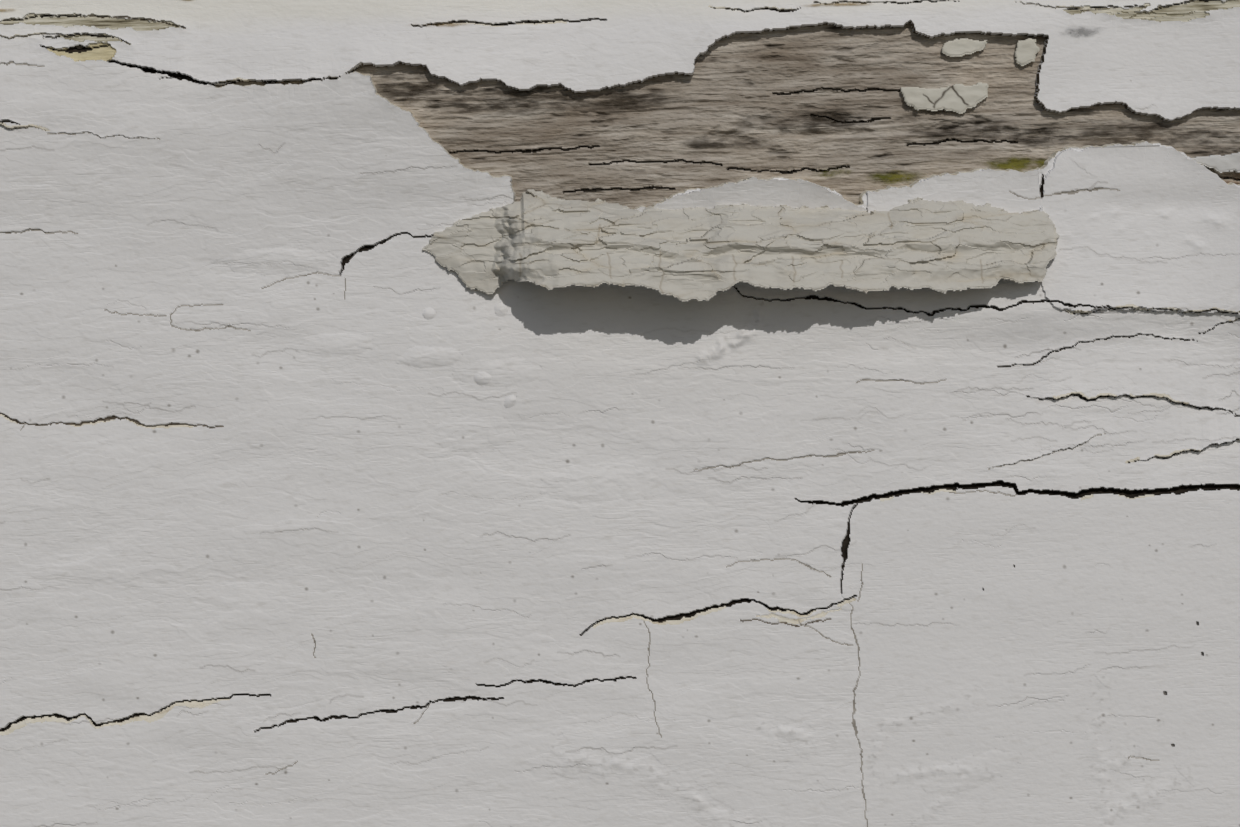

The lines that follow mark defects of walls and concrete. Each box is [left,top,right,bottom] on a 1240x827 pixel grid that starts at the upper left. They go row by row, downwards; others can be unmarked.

peeling [0,0,1240,368]
crack [262,233,434,300]
peeling [1027,392,1240,417]
crack [0,413,224,431]
crack [694,450,875,471]
peeling [1125,439,1240,463]
crack [0,481,1240,827]